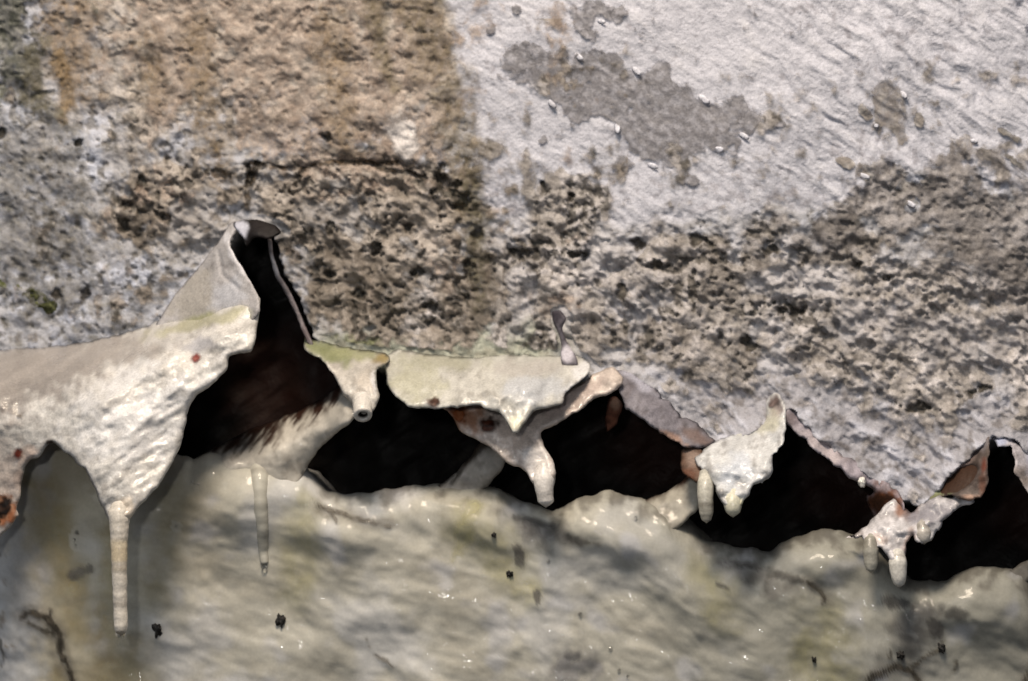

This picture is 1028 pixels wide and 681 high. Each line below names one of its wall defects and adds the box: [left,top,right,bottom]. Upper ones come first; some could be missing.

peeling [570,0,628,42]
spalling [116,76,202,154]
spalling [200,83,266,137]
damp [97,0,483,193]
peeling [500,41,791,187]
peeling [858,78,924,145]
spalling [923,62,933,82]
damp [135,178,194,202]
spalling [0,116,1028,638]
damp [0,386,1028,681]